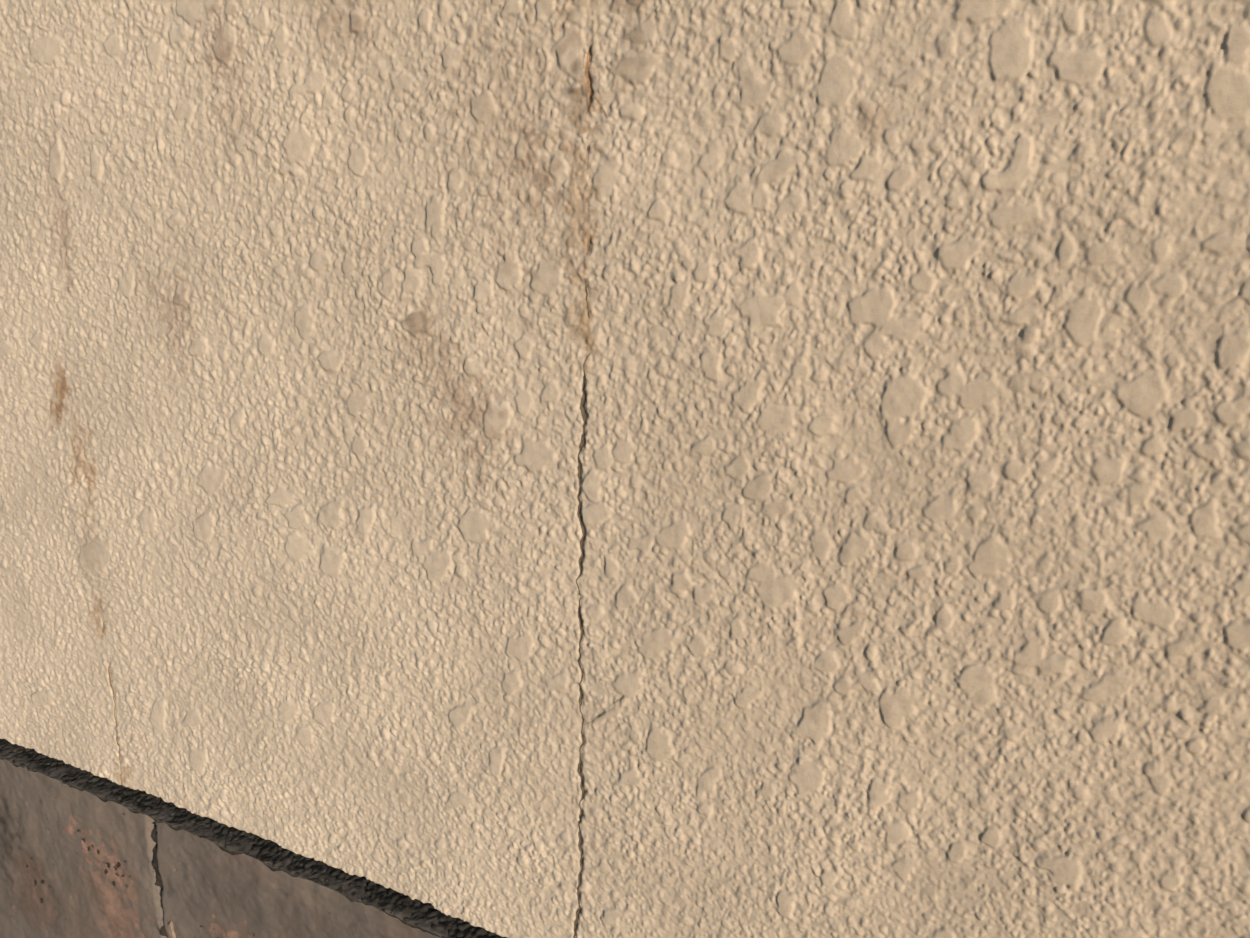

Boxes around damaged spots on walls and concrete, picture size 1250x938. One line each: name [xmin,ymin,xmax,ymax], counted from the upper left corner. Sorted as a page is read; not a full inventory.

crack [586,48,607,117]
crack [583,236,591,318]
crack [96,606,122,785]
crack [573,353,623,938]